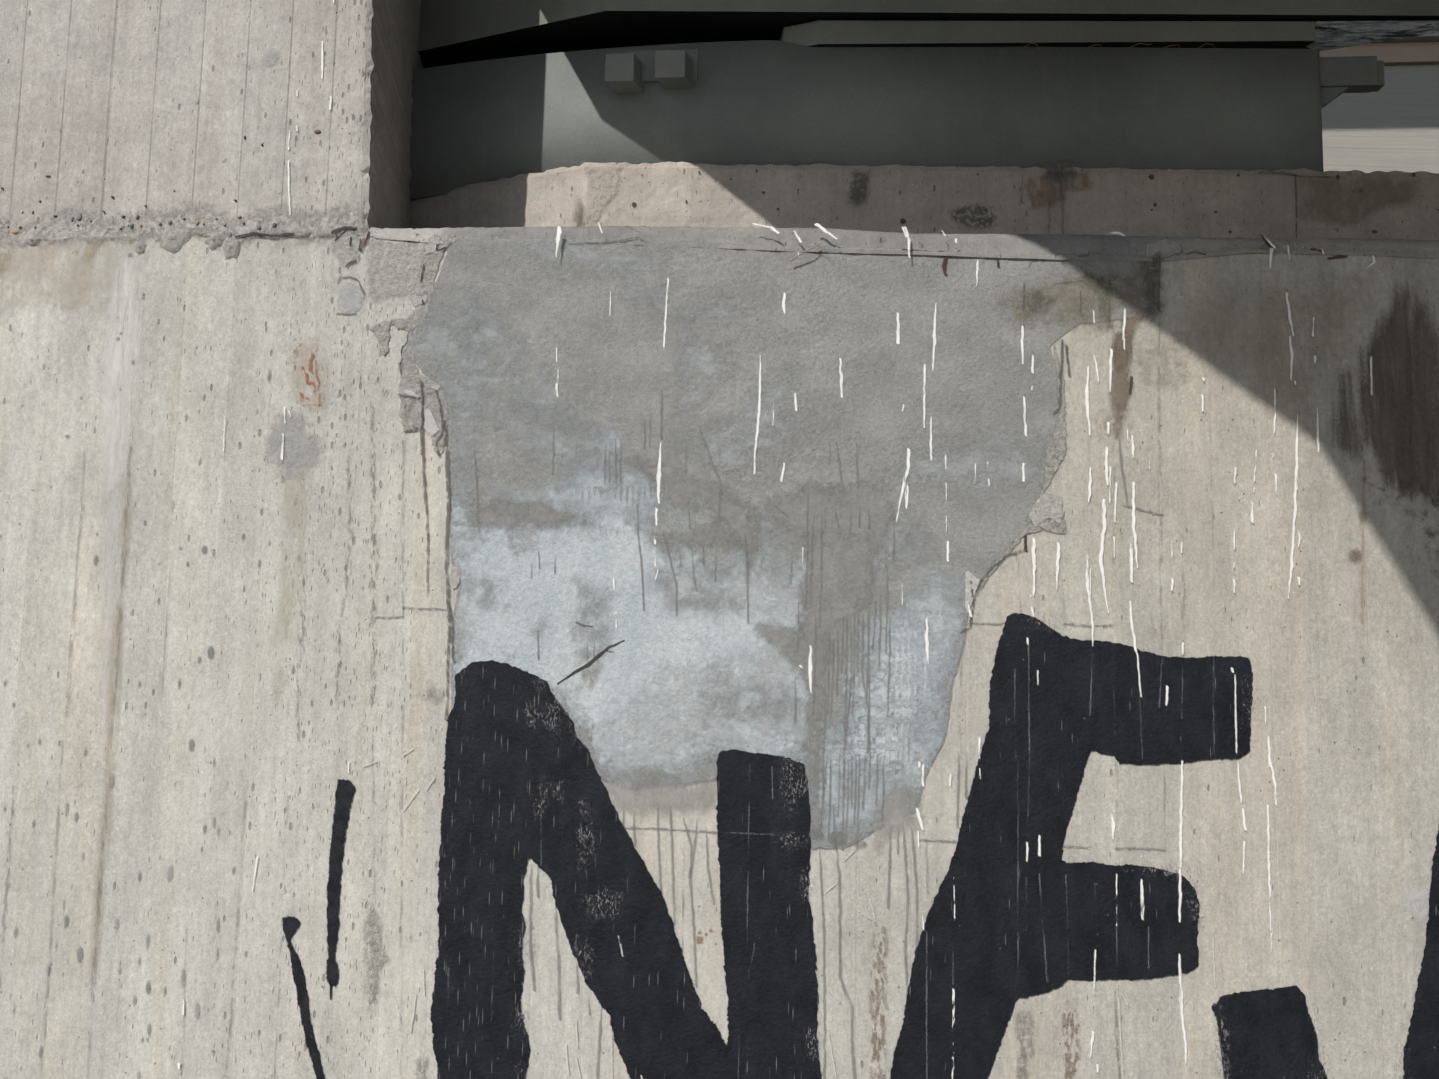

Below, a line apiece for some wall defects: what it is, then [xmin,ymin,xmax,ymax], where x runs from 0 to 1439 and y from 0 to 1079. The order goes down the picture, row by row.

corrosion [294,339,320,406]
spalling [333,229,369,267]
spalling [368,228,456,456]
spalling [960,339,1071,633]
leakage [1012,257,1160,646]
leakage [1285,292,1296,385]
leakage [1288,414,1301,599]
leakage [1340,293,1439,552]
crack [557,622,625,685]
leakage [1129,601,1142,697]